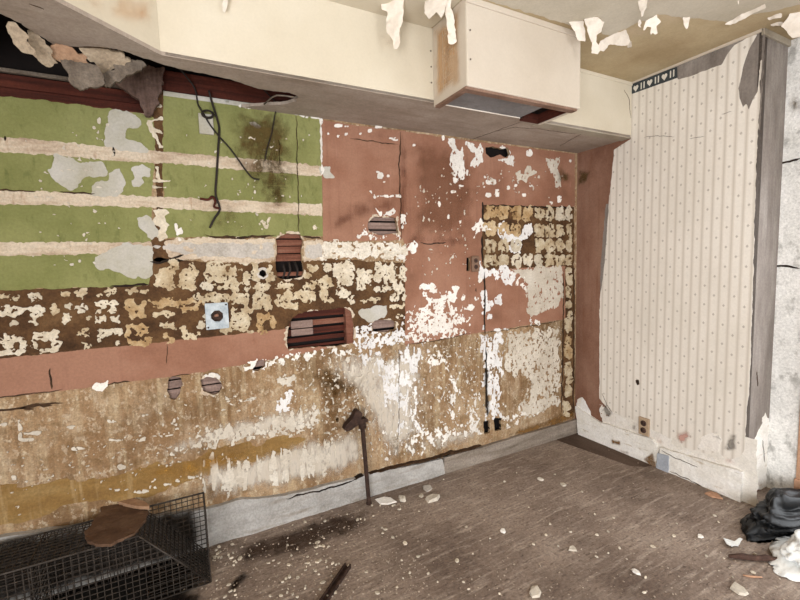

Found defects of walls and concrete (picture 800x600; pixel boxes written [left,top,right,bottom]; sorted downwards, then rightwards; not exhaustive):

peeling [381,0,404,49]
peeling [424,0,457,44]
peeling [569,17,632,54]
peeling [638,0,661,34]
peeling [768,12,800,38]
damp [241,120,285,202]
peeling [0,135,571,498]
damp [207,435,358,492]
crack [289,444,482,499]
flaking render [576,397,759,506]